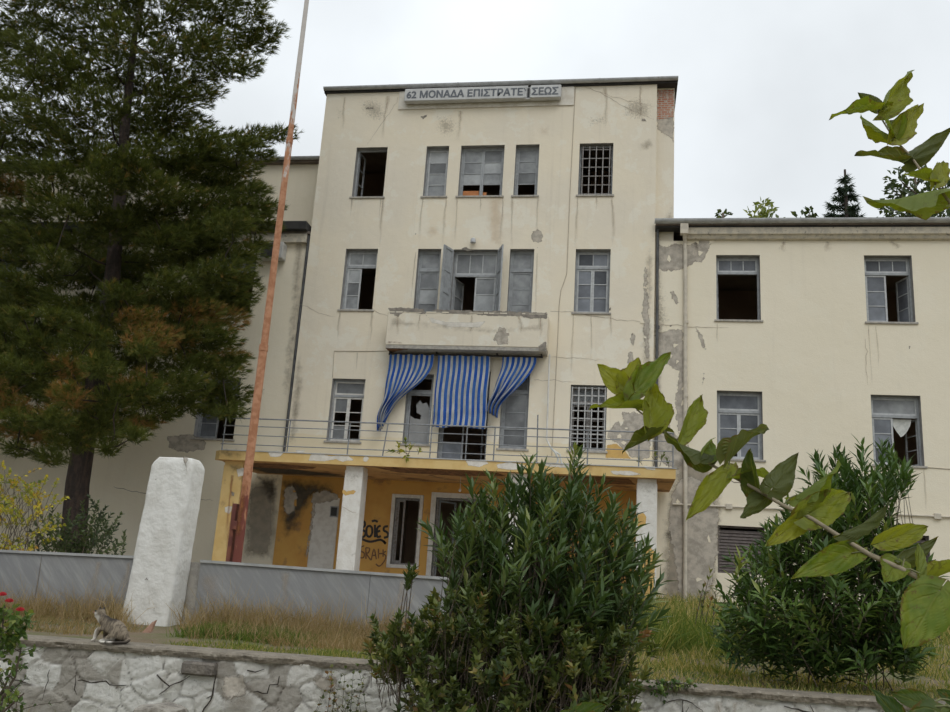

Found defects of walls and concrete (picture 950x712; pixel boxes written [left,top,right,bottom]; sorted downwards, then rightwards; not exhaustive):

peeling [659,241,714,272]
spalling [389,307,547,344]
peeling [545,267,720,603]
spalling [237,450,369,477]
spalling [380,460,526,476]
peeling [284,486,298,514]
leakage [247,467,343,554]
peeling [306,490,356,557]